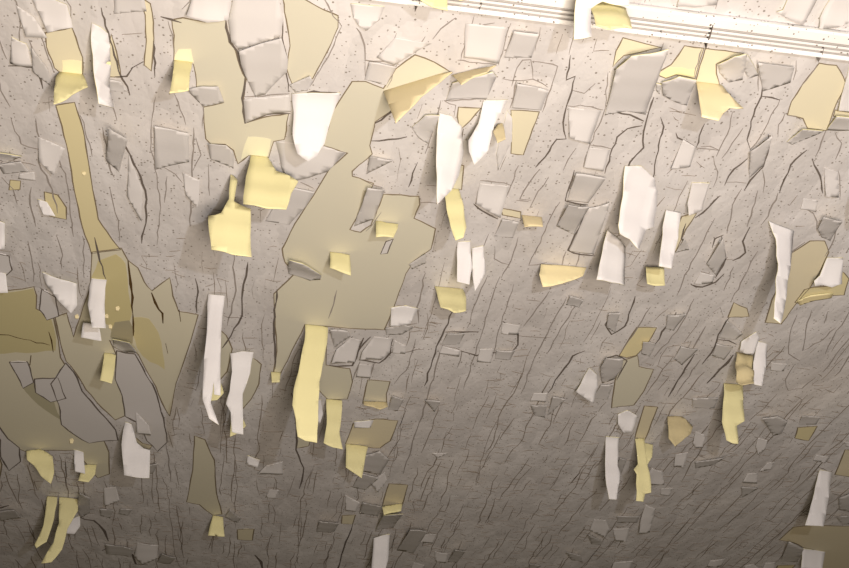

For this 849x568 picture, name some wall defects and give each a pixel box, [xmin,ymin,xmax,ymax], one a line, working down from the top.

crack [0,0,106,299]
peeling [35,493,90,564]
crack [101,0,190,95]
crack [125,94,281,367]
peeling [169,0,543,568]
crack [372,111,447,249]
crack [0,234,849,568]
peeling [576,313,686,545]
crack [458,24,842,301]
peeling [722,332,787,444]
peeling [765,167,849,324]
peeling [787,63,849,145]